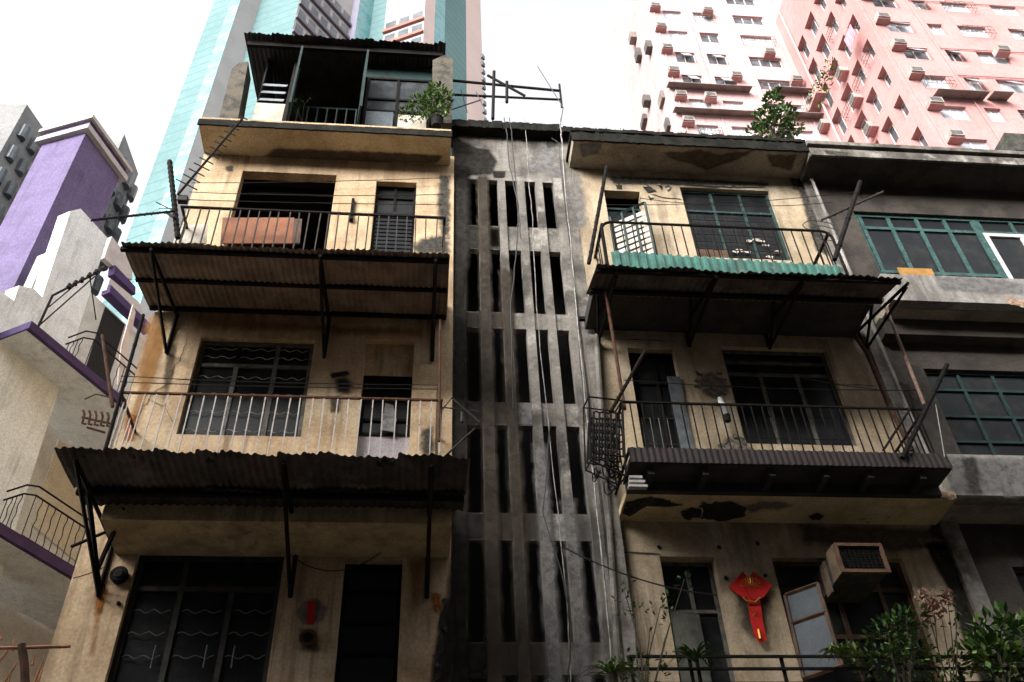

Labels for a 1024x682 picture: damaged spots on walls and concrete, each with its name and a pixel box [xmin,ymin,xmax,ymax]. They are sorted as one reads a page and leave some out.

damp [611,149,768,187]
damp [264,135,592,682]
spalling [623,497,788,522]